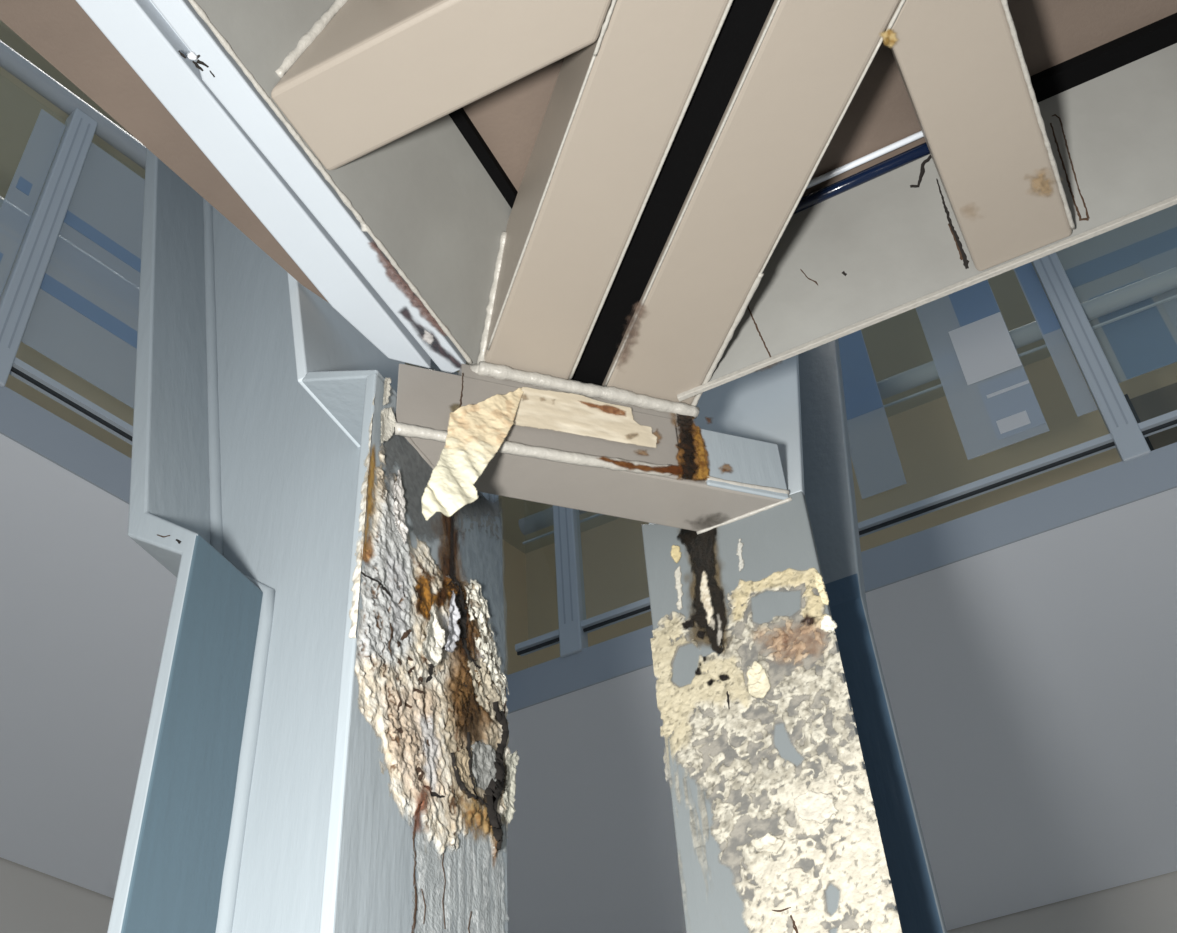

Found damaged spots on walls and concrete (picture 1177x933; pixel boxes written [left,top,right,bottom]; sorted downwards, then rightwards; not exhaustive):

rust [361,224,461,368]
crack [936,179,969,269]
crack [1050,114,1090,221]
rust [599,414,732,481]
peeling [349,378,519,933]
crack [361,572,509,851]
rust [412,514,490,738]
peeling [650,539,902,933]
crack [411,821,472,933]